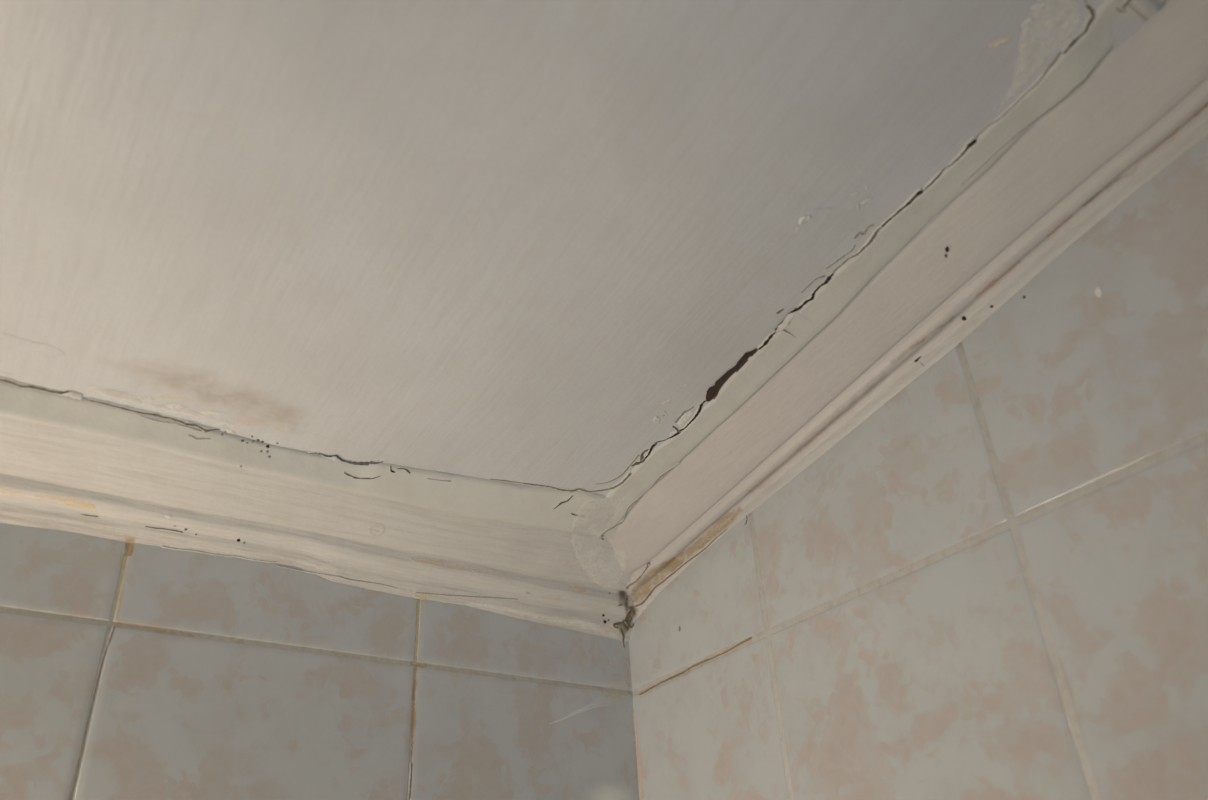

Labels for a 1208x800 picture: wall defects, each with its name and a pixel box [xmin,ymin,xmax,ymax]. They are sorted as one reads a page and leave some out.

crack [490,0,1131,539]
crack [0,372,221,440]
crack [308,451,451,482]